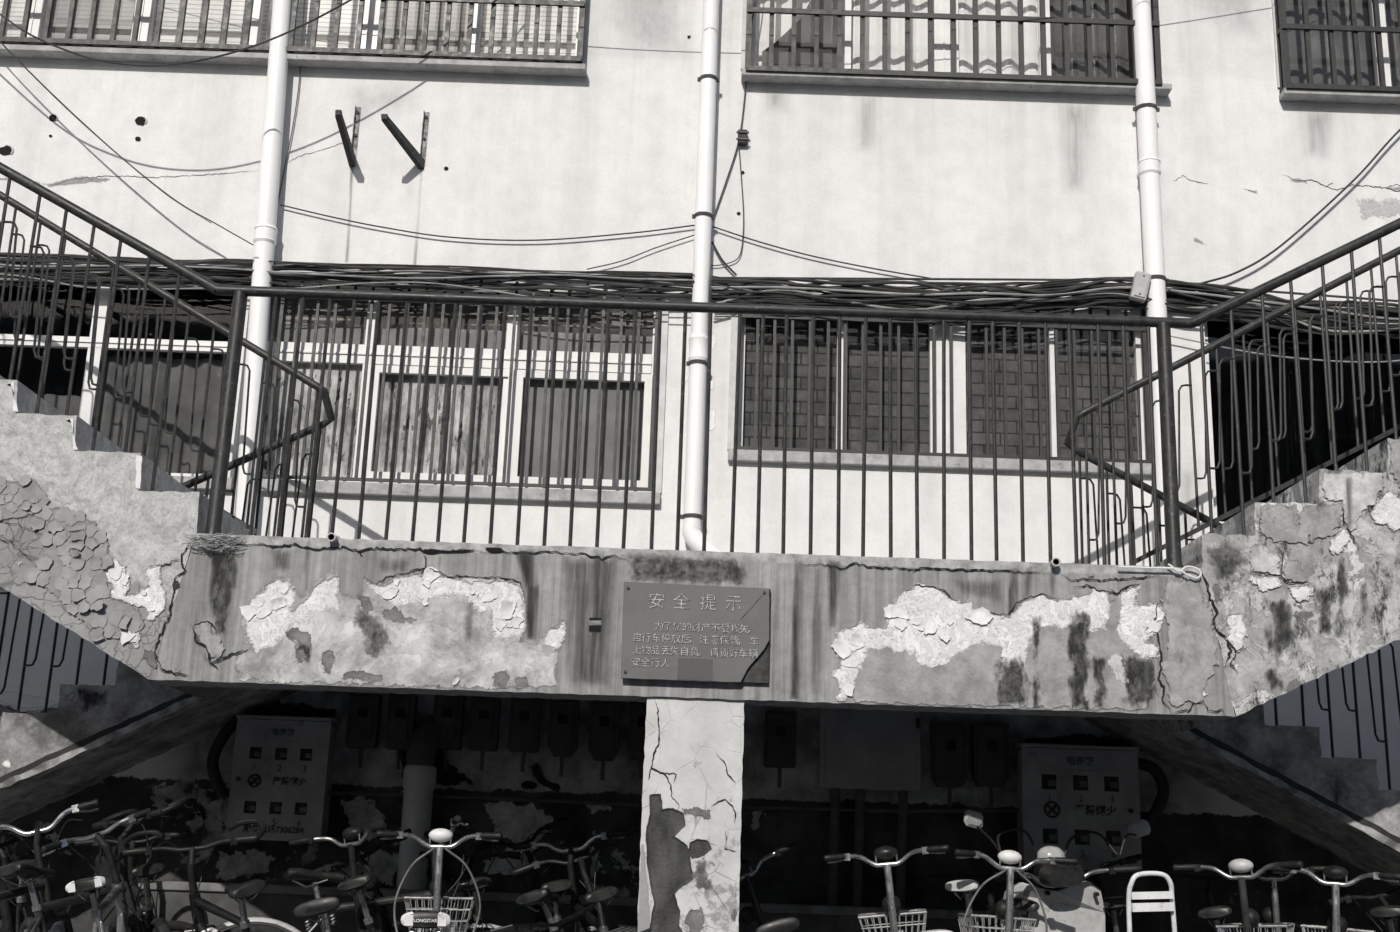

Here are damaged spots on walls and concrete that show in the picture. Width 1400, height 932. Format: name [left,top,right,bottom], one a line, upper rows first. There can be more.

crack [1247,175,1400,194]
peeling [1248,441,1400,602]
peeling [105,553,179,668]
peeling [194,547,567,690]
water stain [998,661,1038,708]
peeling [831,578,1248,711]
water stain [1068,613,1156,710]
water stain [1265,600,1297,652]
water stain [1316,558,1367,634]
crack [648,701,679,808]
crack [712,752,736,851]
spalling [638,794,712,932]